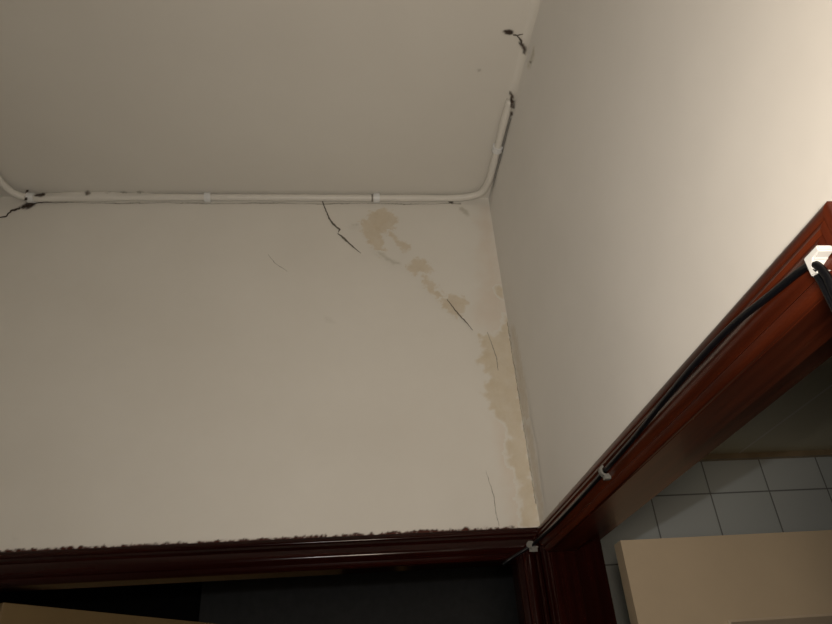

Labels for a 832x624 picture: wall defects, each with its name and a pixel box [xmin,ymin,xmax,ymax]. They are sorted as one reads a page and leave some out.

flaking render [504,30,535,70]
crack [0,190,44,218]
crack [322,201,359,252]
damp [459,198,546,529]